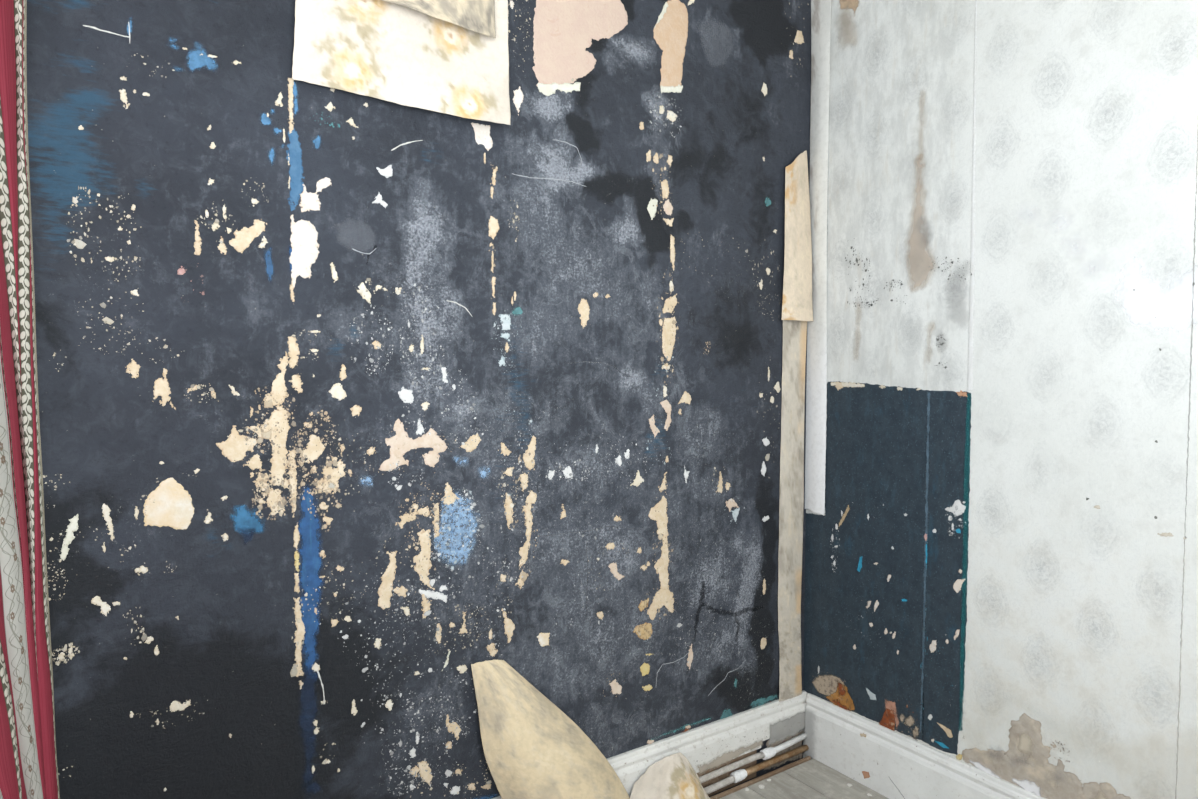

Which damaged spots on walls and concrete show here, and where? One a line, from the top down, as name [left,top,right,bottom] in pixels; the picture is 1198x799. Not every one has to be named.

peeling [119,76,150,109]
flaking render [508,0,628,96]
flaking render [639,0,695,137]
peeling [471,122,498,199]
peeling [177,180,274,298]
water stain [845,185,972,307]
peeling [66,186,219,410]
peeling [134,461,213,530]
peeling [924,500,966,568]
peeling [91,596,159,660]
peeling [130,700,208,728]
flaking render [923,708,1131,799]